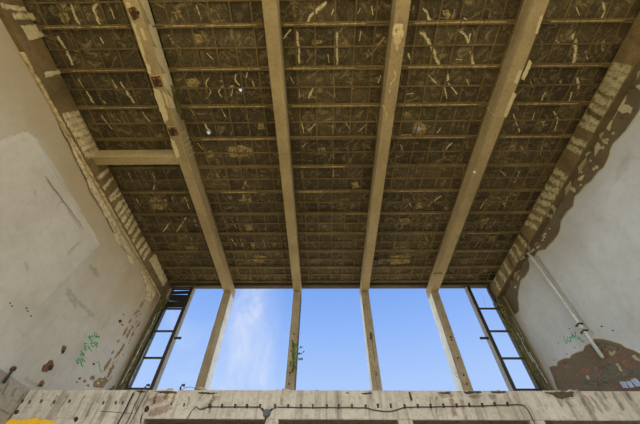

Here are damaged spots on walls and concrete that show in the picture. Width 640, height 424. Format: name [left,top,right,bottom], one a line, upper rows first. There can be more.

peeling [19,52,162,388]
peeling [126,0,180,159]
peeling [499,57,640,315]
peeling [540,338,640,401]